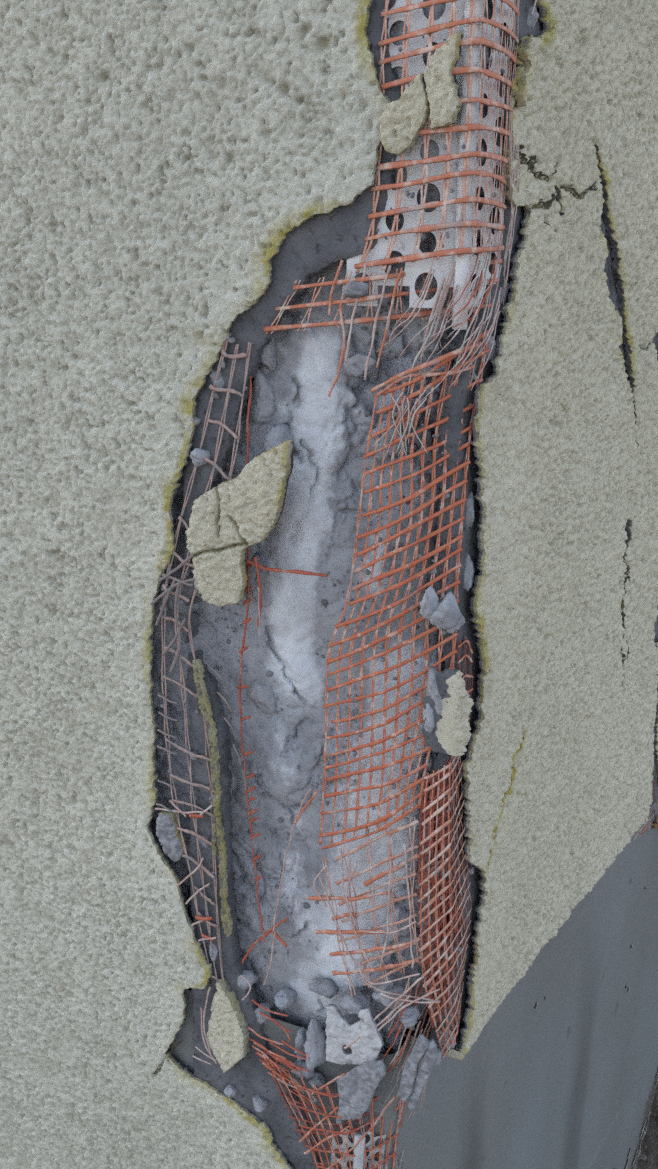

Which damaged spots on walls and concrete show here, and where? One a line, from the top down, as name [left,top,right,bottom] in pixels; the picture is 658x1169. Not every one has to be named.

crack [512,144,658,447]
spalling [147,0,551,1169]
crack [488,737,524,866]
crack [620,519,658,810]